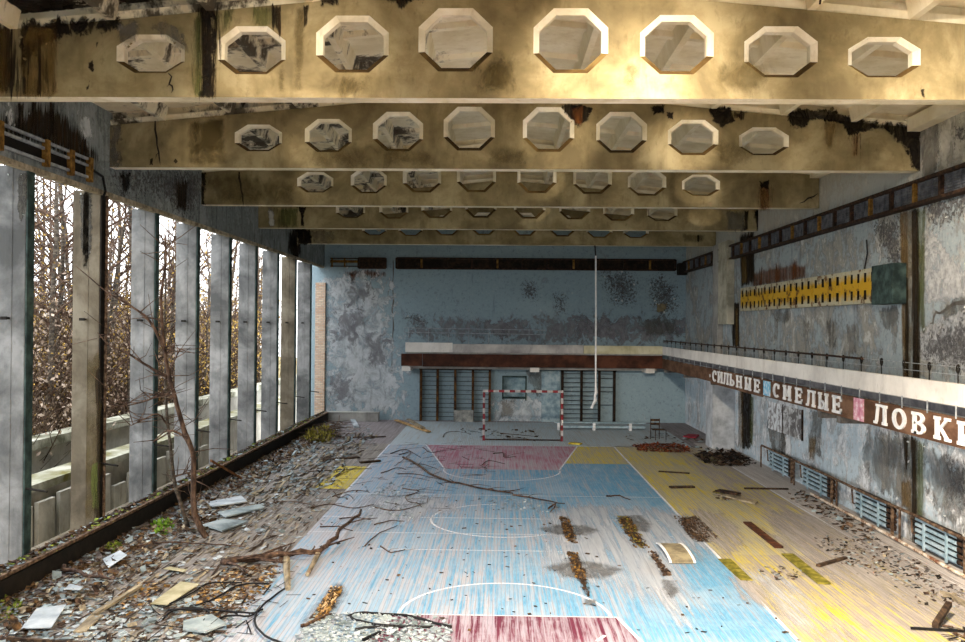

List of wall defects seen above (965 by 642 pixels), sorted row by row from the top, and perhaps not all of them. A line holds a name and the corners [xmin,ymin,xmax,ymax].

damp [296,5,308,43]
damp [0,0,242,227]
crack [153,121,161,162]
crack [930,300,965,324]
peeling [322,265,429,420]